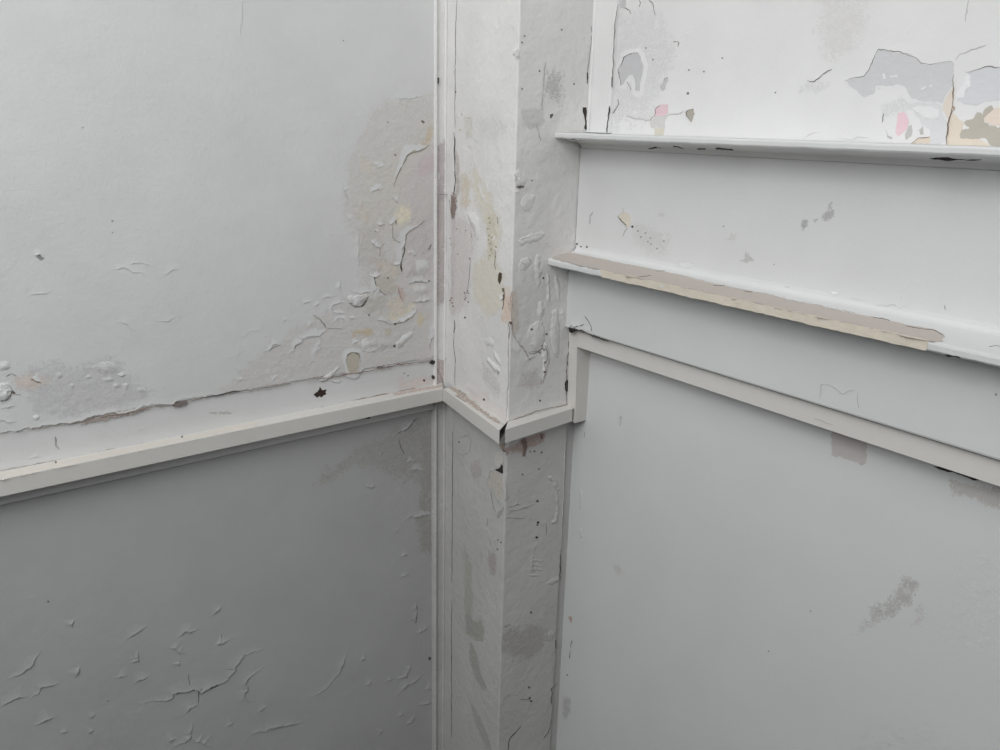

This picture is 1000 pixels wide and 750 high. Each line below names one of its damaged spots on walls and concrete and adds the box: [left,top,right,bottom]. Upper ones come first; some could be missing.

peeling [616,46,654,98]
peeling [682,92,699,127]
peeling [839,39,1000,146]
water stain [214,91,521,395]
peeling [552,243,945,351]
peeling [0,386,240,433]
crack [0,321,464,471]
peeling [341,338,364,379]